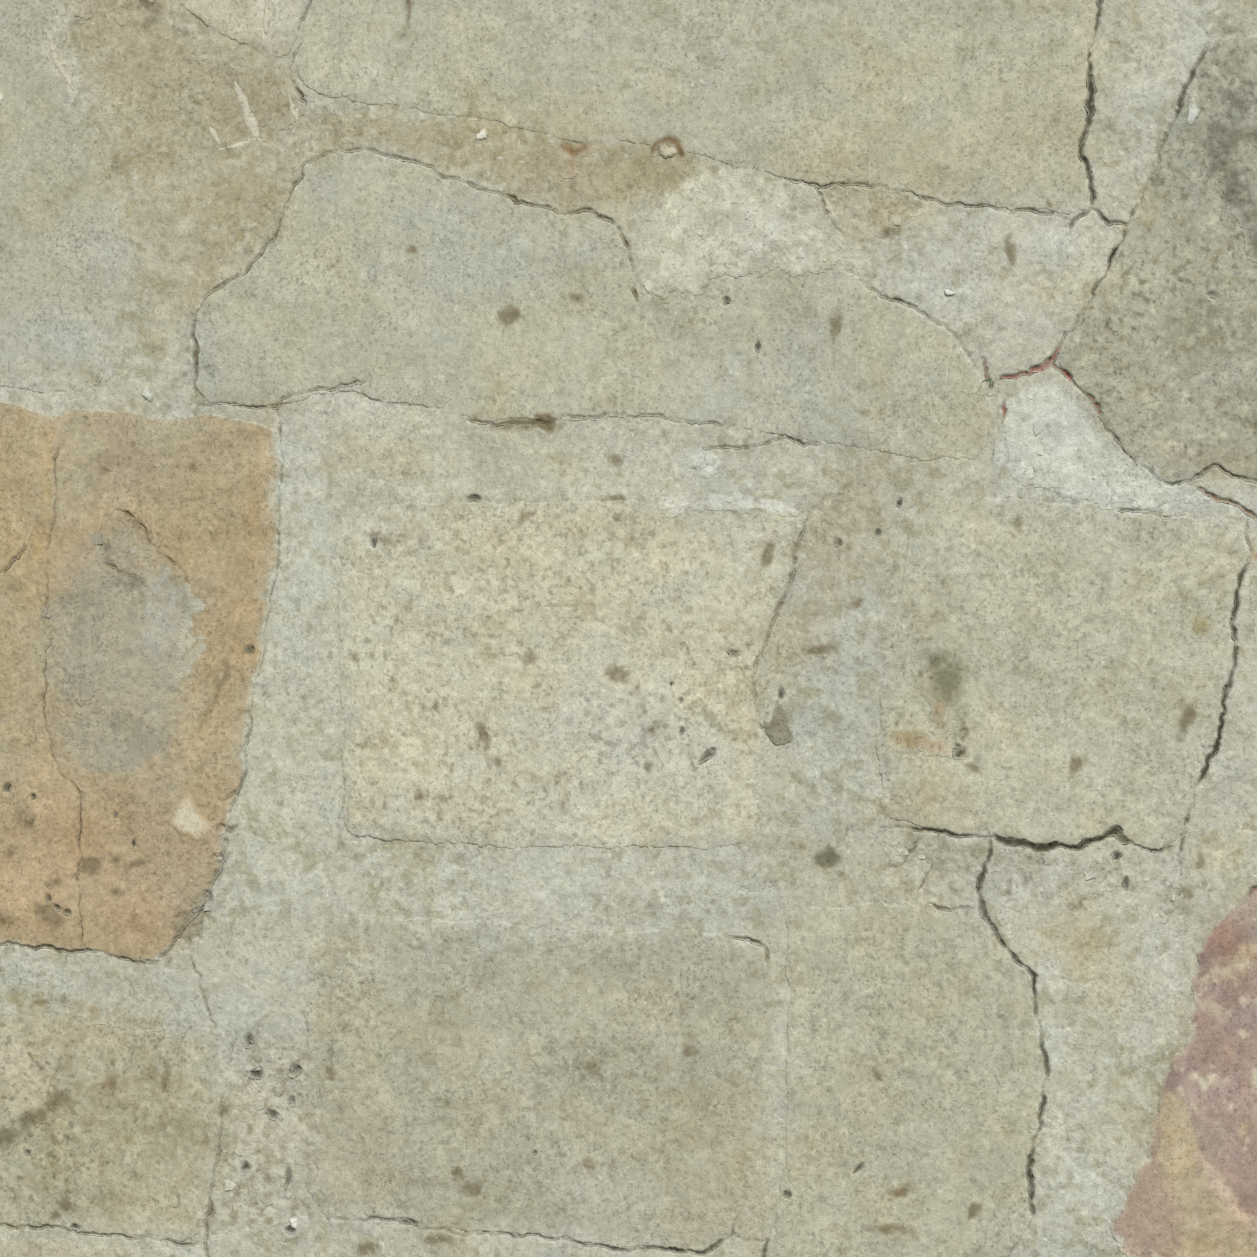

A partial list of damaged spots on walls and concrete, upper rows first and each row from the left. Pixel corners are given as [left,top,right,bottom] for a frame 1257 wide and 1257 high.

crack [290,0,312,105]
crack [467,413,822,450]
crack [751,517,809,735]
crack [786,0,1257,1257]
crack [0,148,638,1257]
crack [725,936,769,968]
crack [334,1216,769,1257]